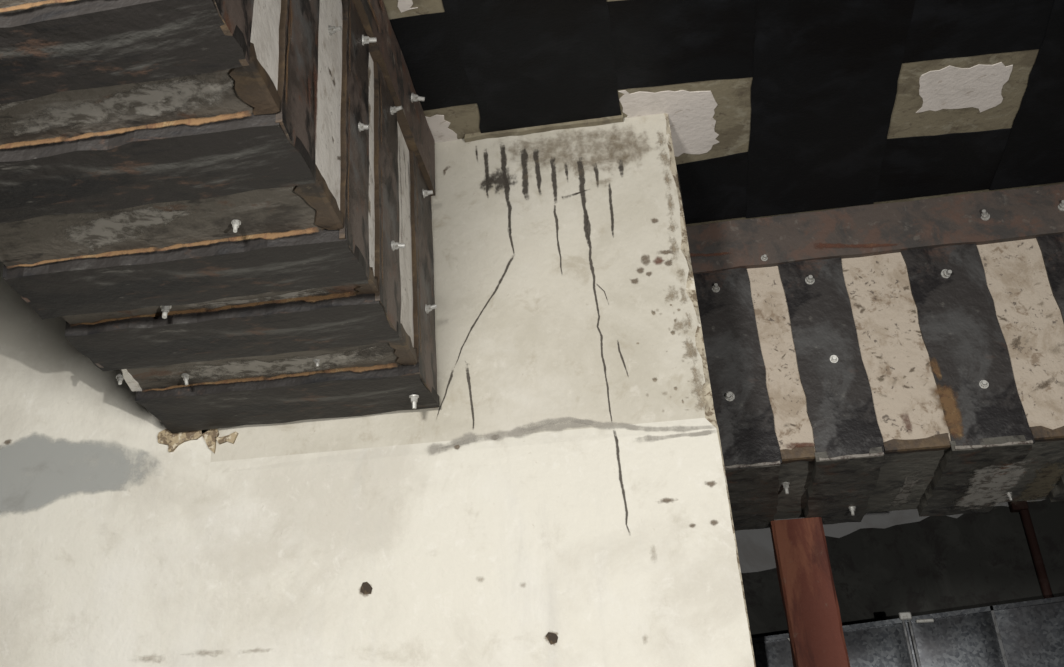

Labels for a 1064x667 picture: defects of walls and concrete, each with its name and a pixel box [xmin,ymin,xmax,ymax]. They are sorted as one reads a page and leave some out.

rust [0,0,73,12]
rust [0,111,247,149]
damp [475,134,641,243]
rust [10,227,316,267]
rust [75,291,353,325]
crack [430,206,711,530]
peeling [157,429,239,453]
damp [0,435,144,513]